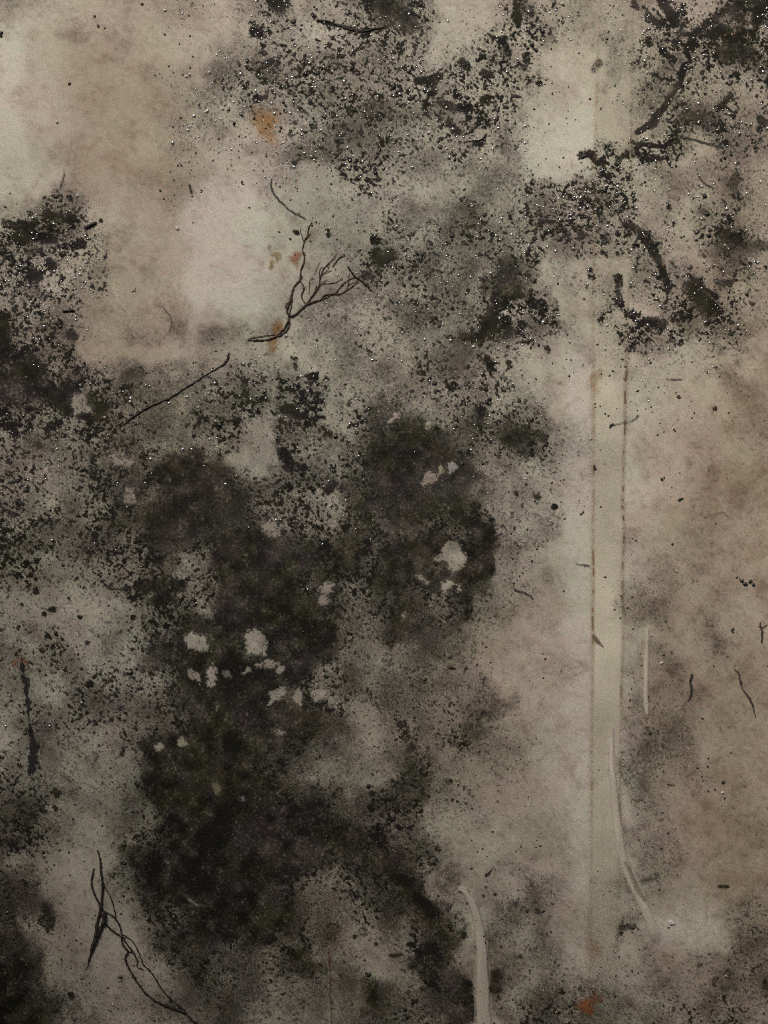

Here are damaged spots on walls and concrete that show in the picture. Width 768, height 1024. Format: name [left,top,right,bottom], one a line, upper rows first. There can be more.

crack [270,178,306,219]
crack [20,662,39,775]